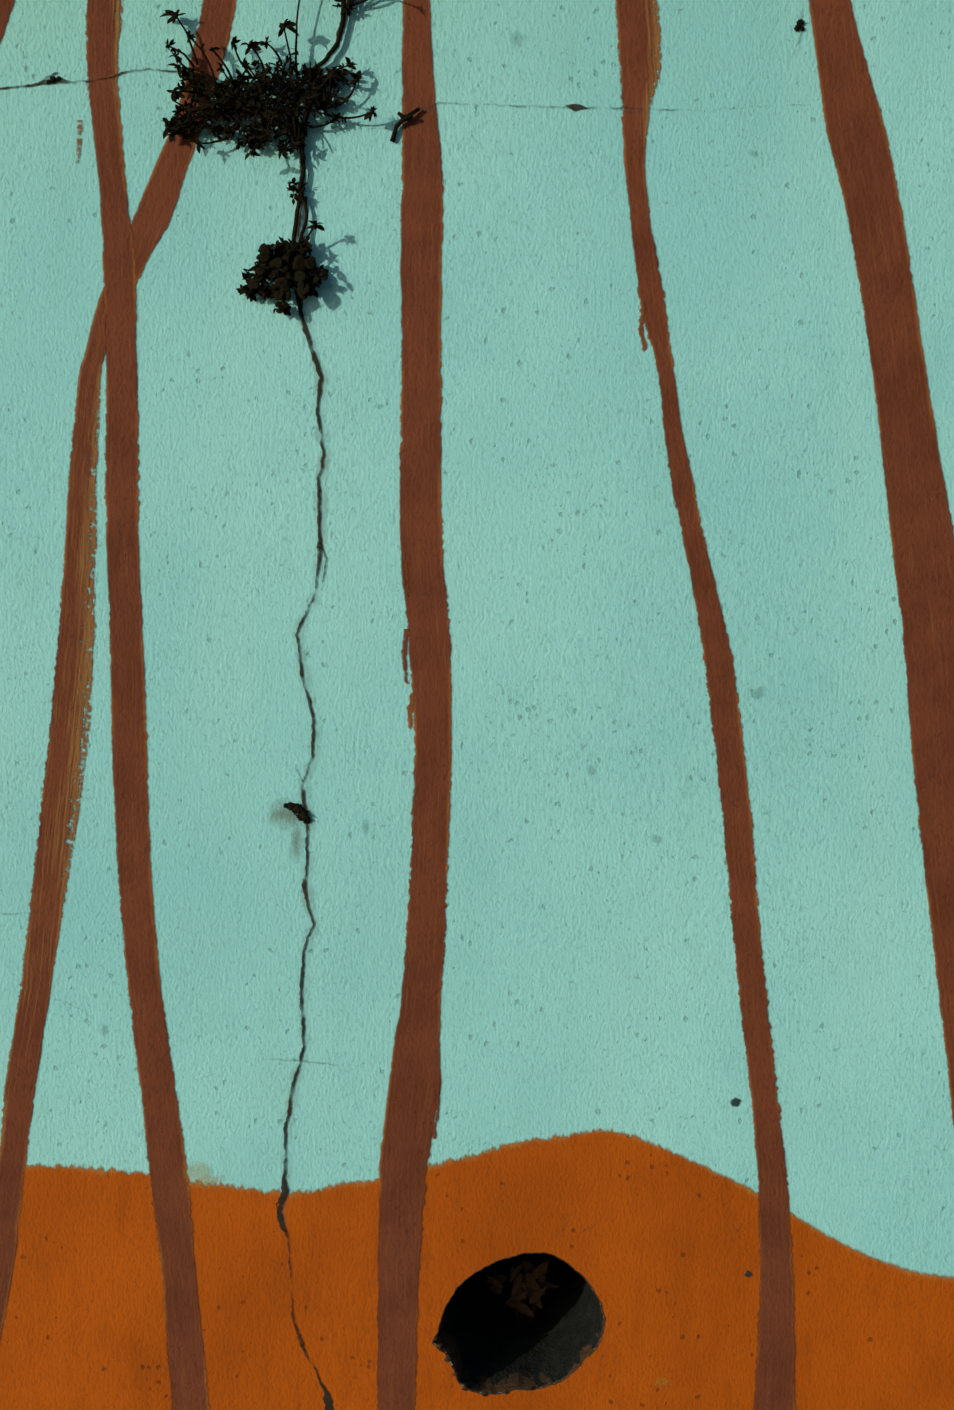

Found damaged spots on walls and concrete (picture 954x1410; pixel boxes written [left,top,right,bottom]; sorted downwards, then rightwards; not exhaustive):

crack [0,68,178,89]
crack [566,103,587,111]
crack [276,283,333,1410]